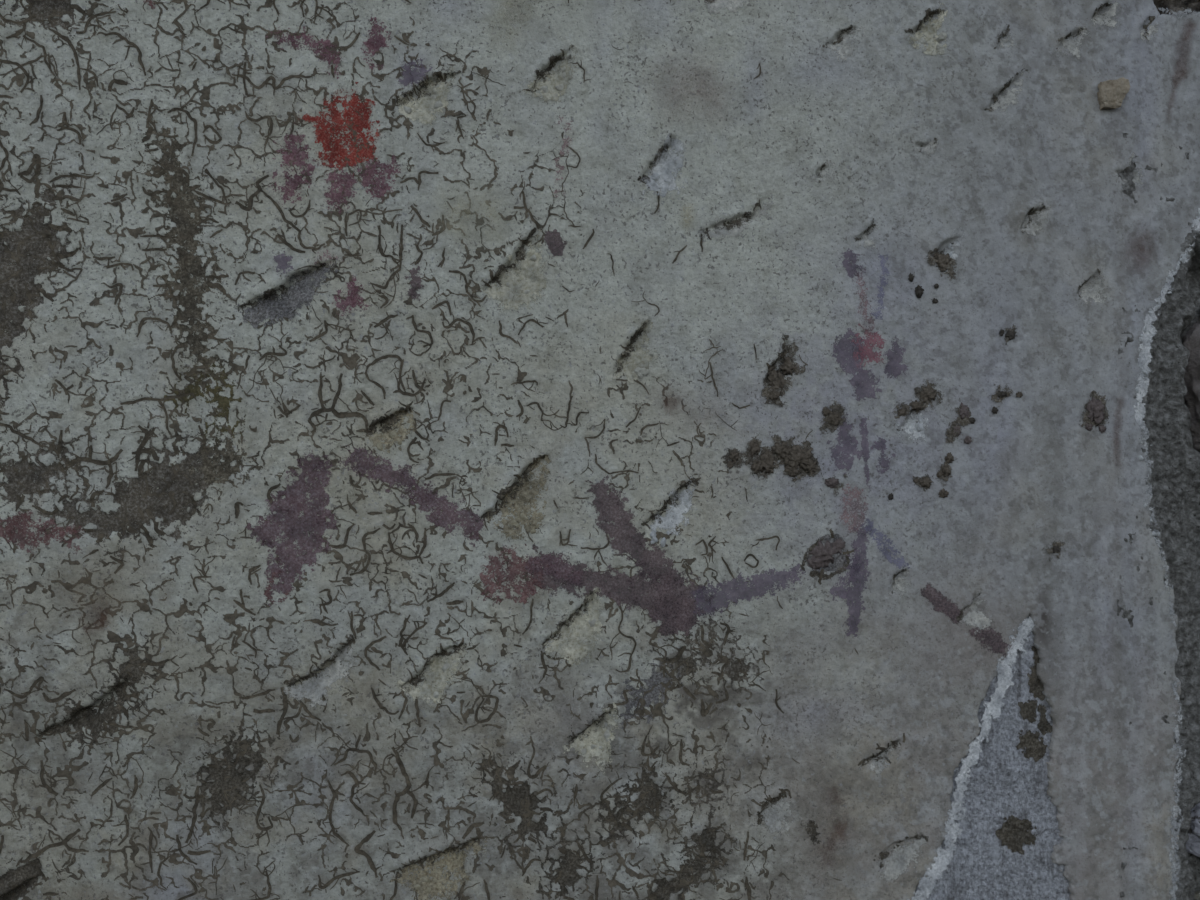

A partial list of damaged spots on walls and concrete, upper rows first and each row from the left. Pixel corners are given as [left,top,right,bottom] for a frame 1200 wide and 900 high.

spalling [904,3,948,55]
spalling [985,65,1029,118]
crack [0,0,554,489]
crack [514,191,614,271]
crack [494,373,679,474]
crack [685,536,780,579]
crack [0,676,76,796]
crack [242,475,463,900]
crack [514,599,571,678]
crack [607,604,636,706]
spalling [873,617,1071,900]
crack [91,775,211,900]